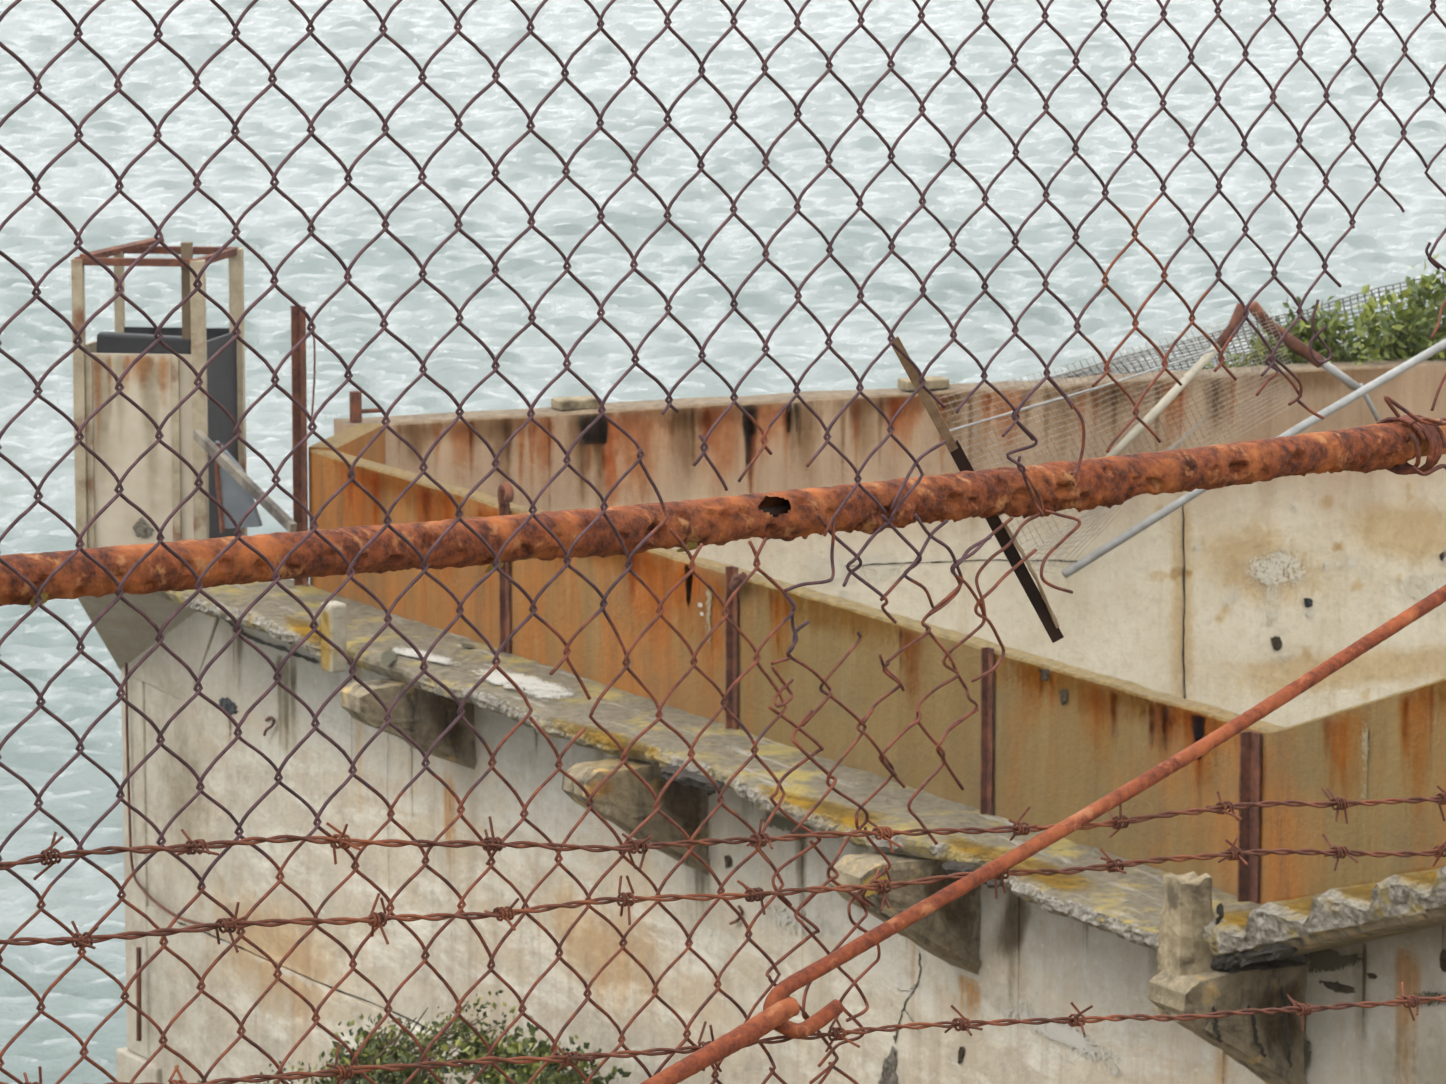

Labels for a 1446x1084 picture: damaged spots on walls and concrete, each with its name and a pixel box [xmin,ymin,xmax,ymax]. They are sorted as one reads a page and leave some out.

crack [894,952,921,1044]
spalling [1210,944,1297,970]